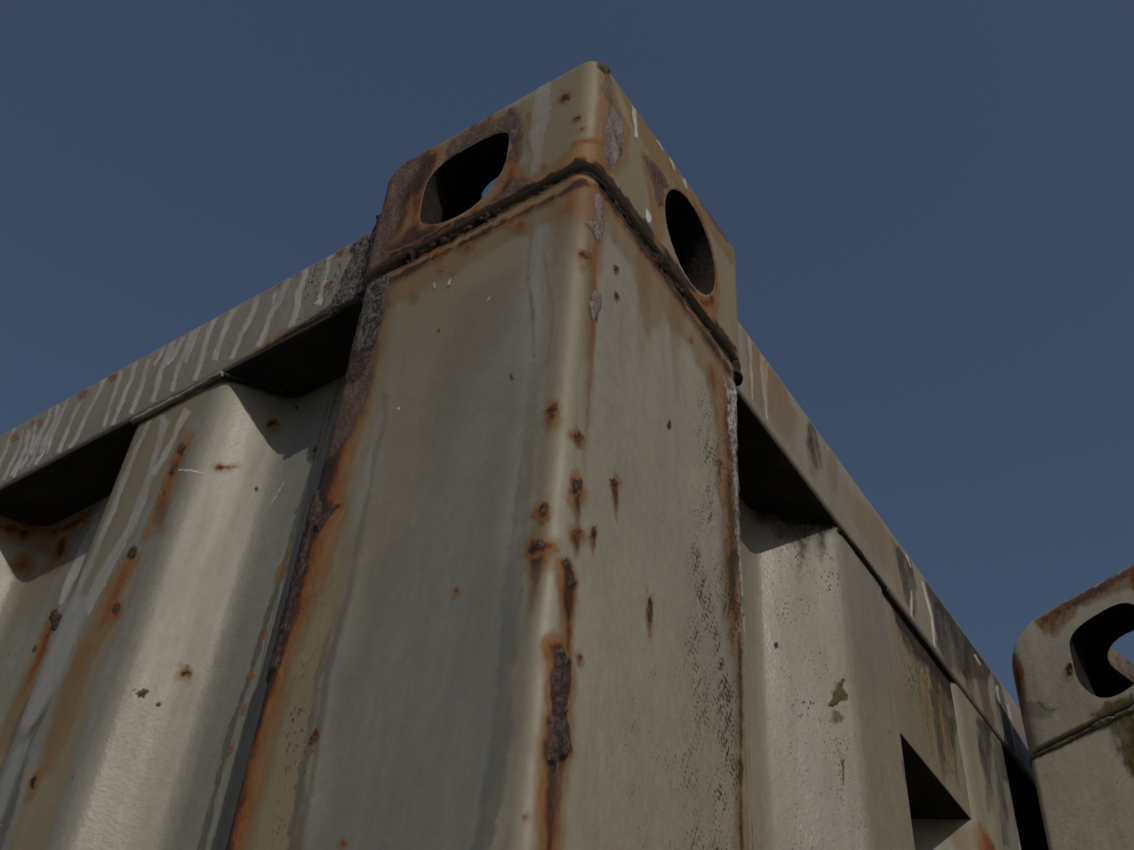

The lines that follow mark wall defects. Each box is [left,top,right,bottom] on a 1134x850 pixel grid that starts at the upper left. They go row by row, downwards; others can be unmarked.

corrosion [0,512,91,578]
corrosion [14,429,193,850]
corrosion [198,62,738,850]
corrosion [1036,564,1134,631]